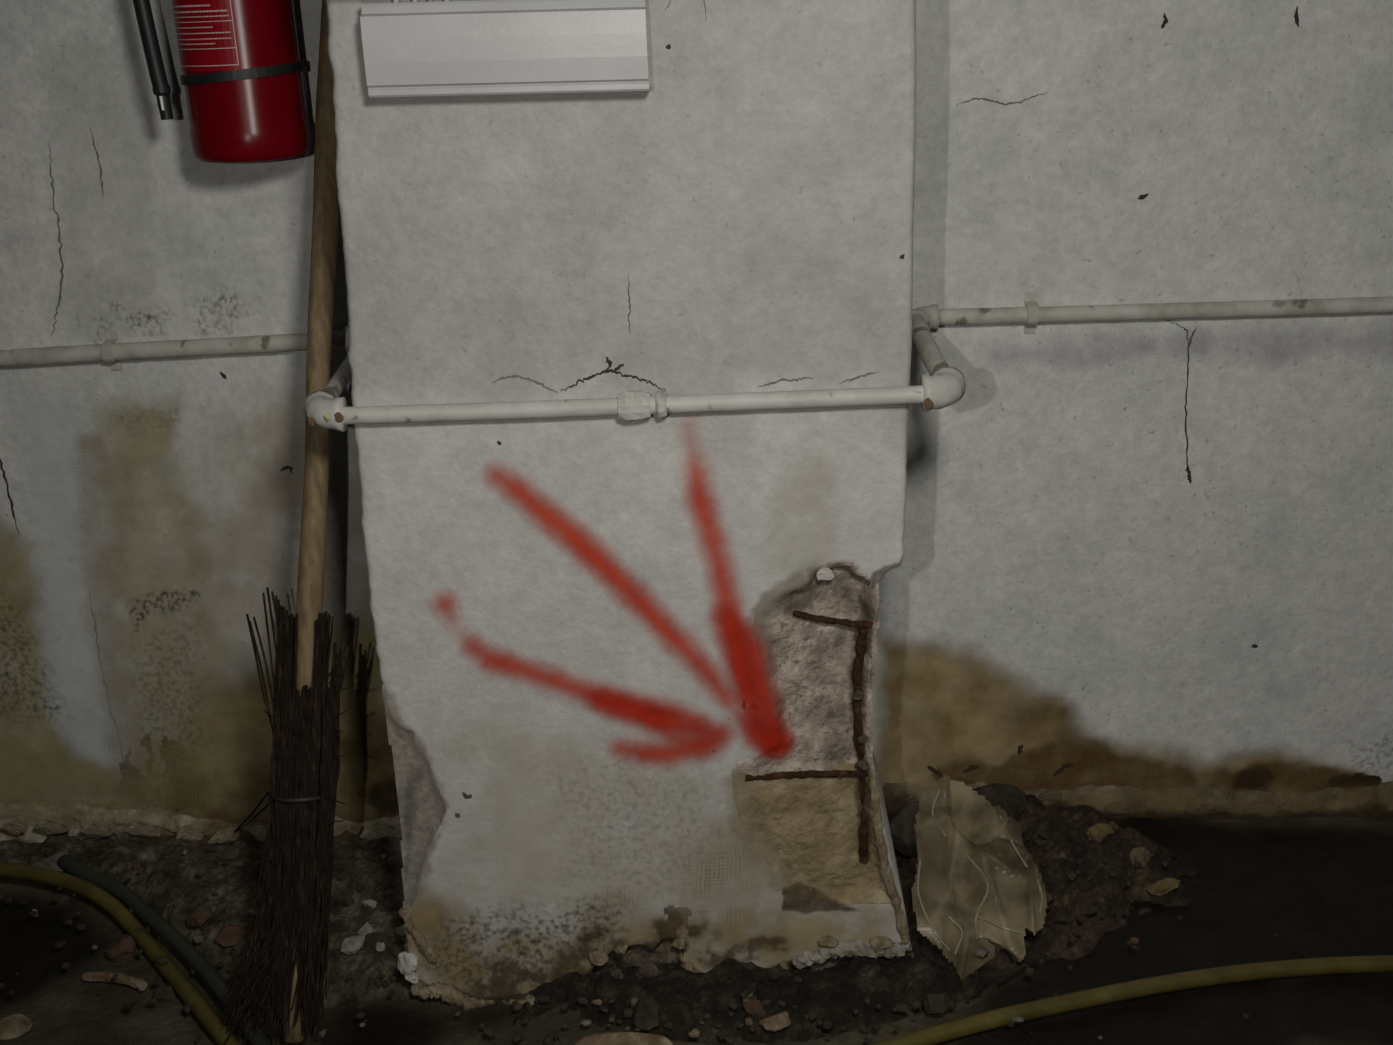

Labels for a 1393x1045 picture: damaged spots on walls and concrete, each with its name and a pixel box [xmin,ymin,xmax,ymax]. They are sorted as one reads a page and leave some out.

crack [48,142,64,337]
crack [90,129,104,195]
crack [758,372,876,387]
crack [1164,319,1196,483]
damp [148,416,305,844]
damp [323,560,399,823]
spalling [341,685,535,1010]
spalling [731,561,988,970]
damp [877,643,1373,815]
spalling [1023,781,1393,817]
damp [411,905,879,999]
spalling [588,938,703,979]